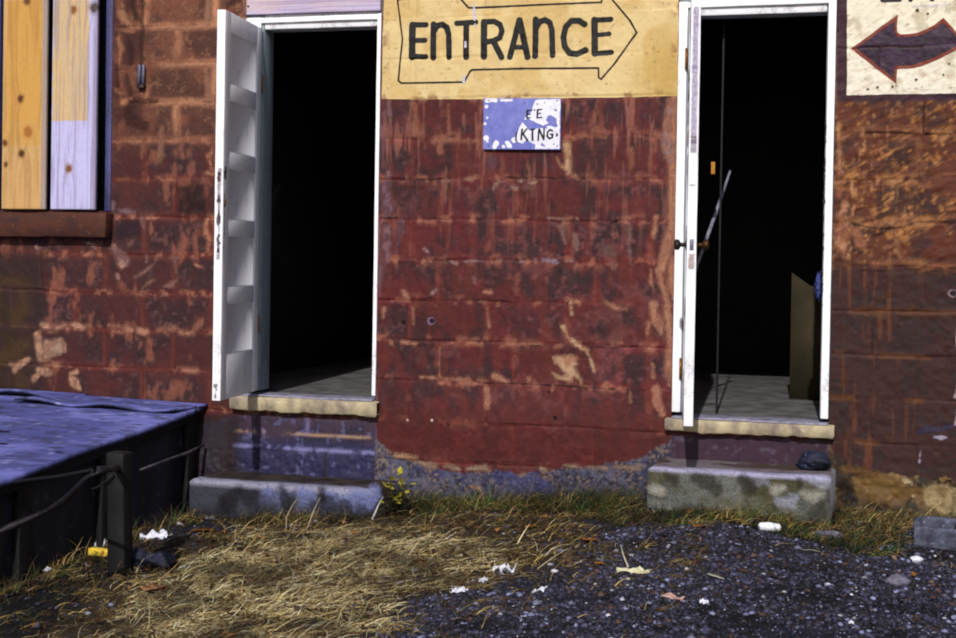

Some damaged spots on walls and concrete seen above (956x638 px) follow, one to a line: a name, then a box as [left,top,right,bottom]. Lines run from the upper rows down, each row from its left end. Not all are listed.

peeling [822,121,918,266]
peeling [69,369,81,390]
peeling [9,318,213,382]
peeling [553,325,594,383]
spalling [387,450,491,472]
spalling [902,477,956,514]